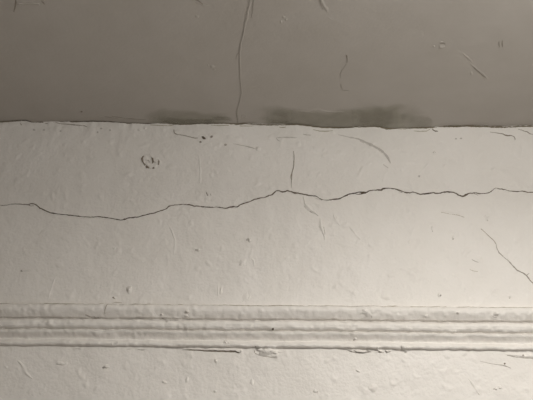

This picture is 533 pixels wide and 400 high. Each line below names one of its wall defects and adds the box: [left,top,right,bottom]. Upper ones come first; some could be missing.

crack [0,0,533,142]
crack [0,151,533,221]
crack [481,229,533,283]